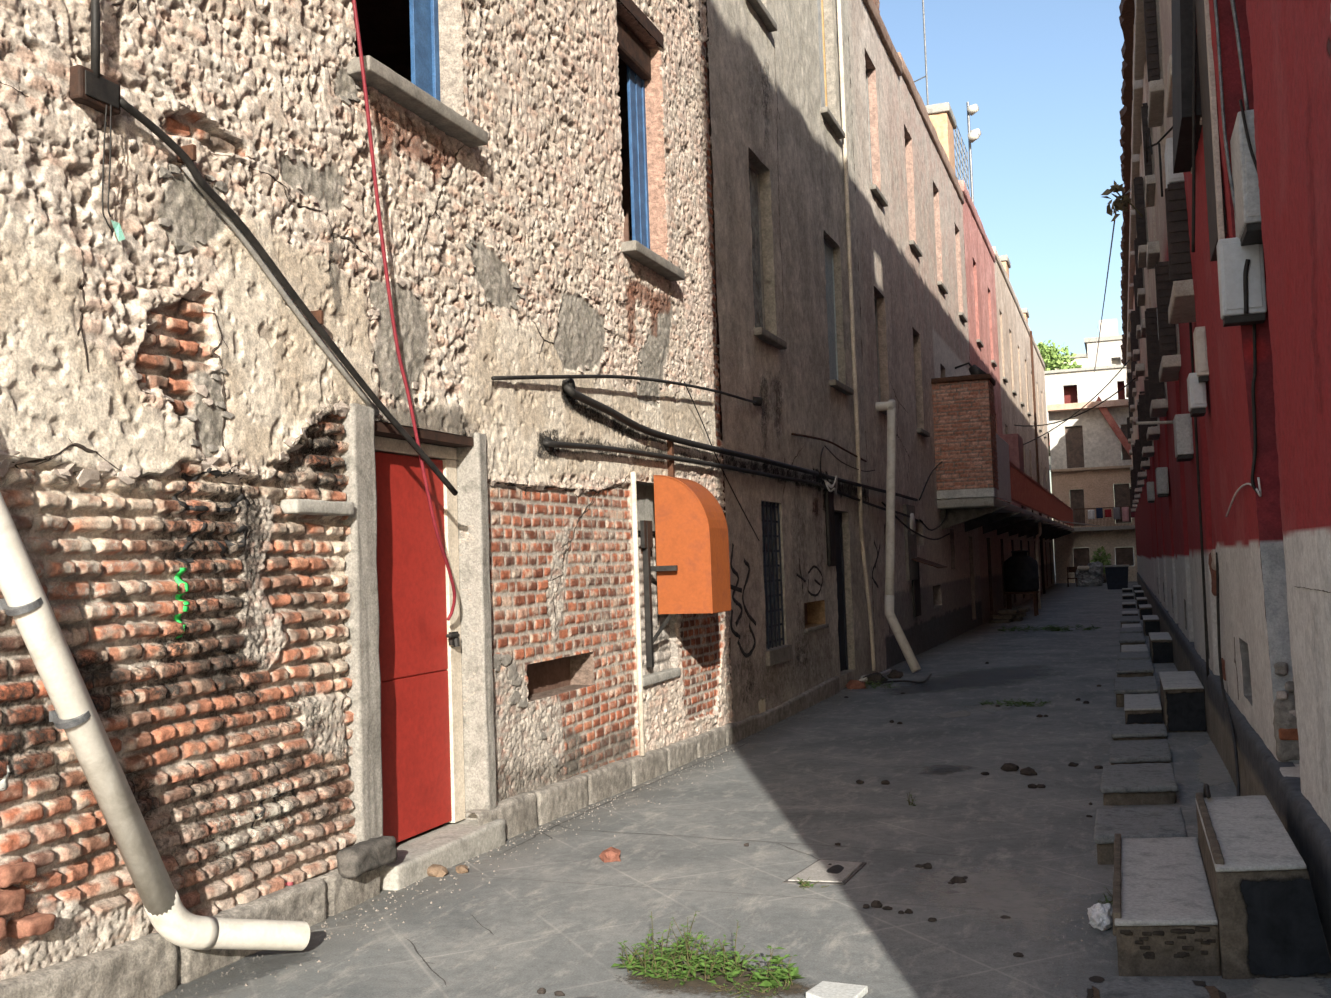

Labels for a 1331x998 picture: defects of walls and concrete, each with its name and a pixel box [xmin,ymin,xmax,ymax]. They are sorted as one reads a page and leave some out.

crack [77,245,89,372]
crack [12,438,121,477]
peeling [0,288,397,916]
damp [211,649,337,740]
peeling [487,478,640,803]
peeling [679,612,726,721]
peeling [0,590,157,980]
damp [218,784,296,857]